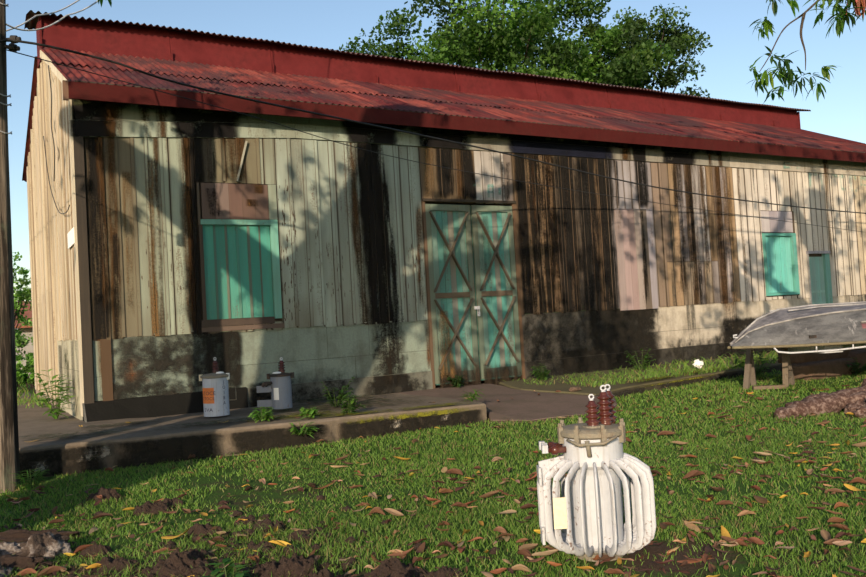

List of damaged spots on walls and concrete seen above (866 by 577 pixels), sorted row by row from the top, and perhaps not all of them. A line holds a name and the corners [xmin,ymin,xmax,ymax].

leakage [70,99,271,407]
leakage [342,121,776,396]
leakage [823,159,832,256]